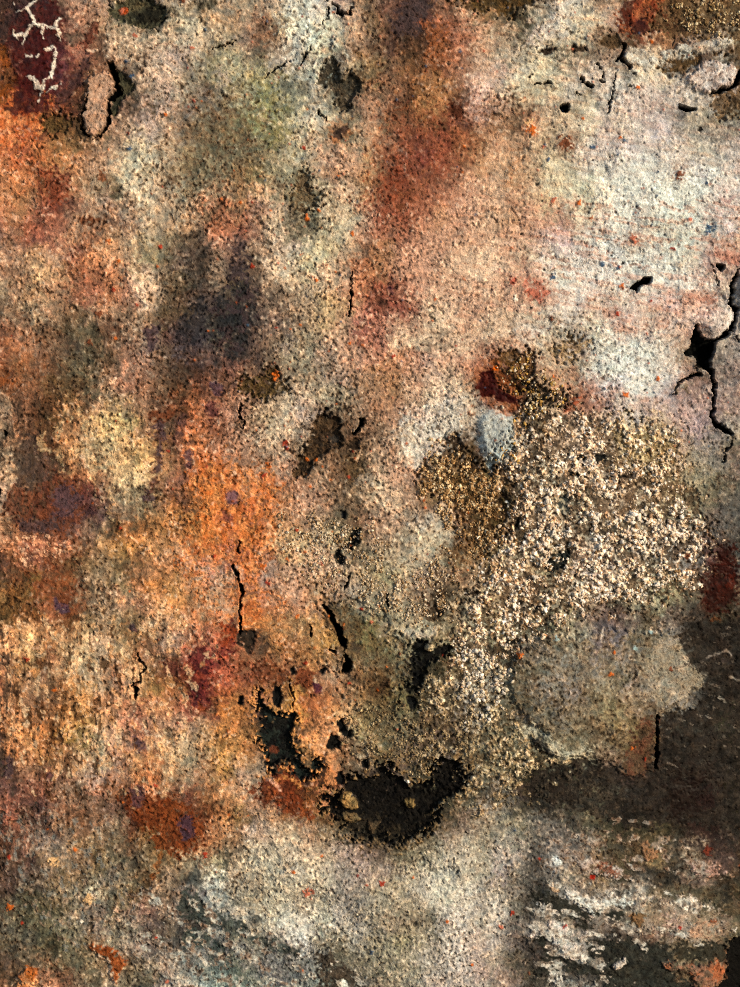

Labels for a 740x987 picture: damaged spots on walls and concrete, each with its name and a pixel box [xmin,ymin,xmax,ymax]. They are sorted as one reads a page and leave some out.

crack [0,0,71,122]
flaking render [36,69,135,142]
crack [79,60,123,140]
rust [325,13,501,242]
rust [338,254,424,338]
crack [672,263,740,464]
water stain [387,373,479,486]
rust [140,405,333,720]
water stain [329,580,442,644]
water stain [373,507,463,572]
flaking render [276,327,726,820]
flaking render [660,958,725,987]